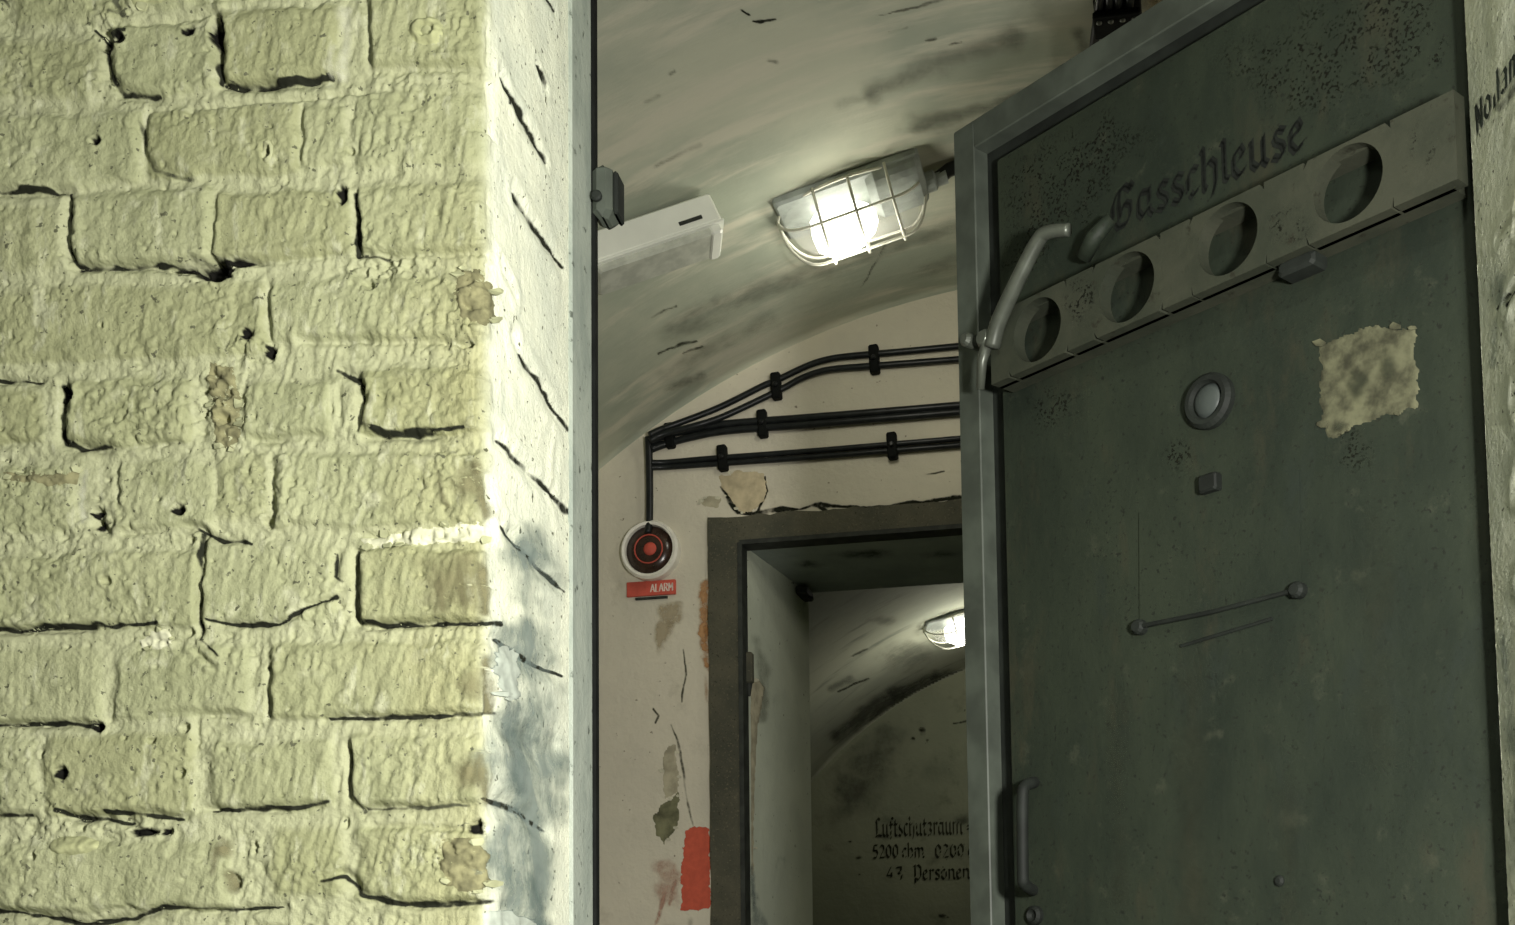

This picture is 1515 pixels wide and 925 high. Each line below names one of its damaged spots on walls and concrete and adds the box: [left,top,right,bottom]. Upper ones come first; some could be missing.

spalling [450,265,504,326]
spalling [697,470,870,515]
spalling [892,495,962,505]
spalling [653,744,682,845]